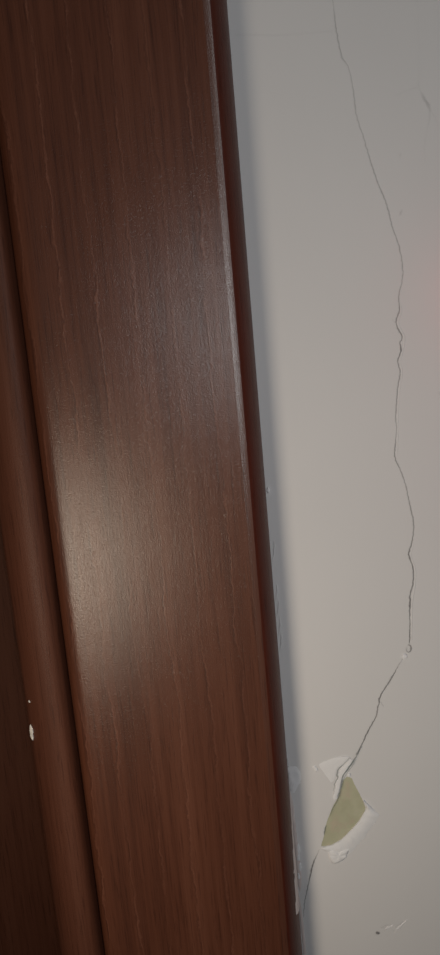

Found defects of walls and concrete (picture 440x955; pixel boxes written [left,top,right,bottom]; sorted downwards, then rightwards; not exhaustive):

peeling [287,761,301,793]
peeling [312,750,379,864]